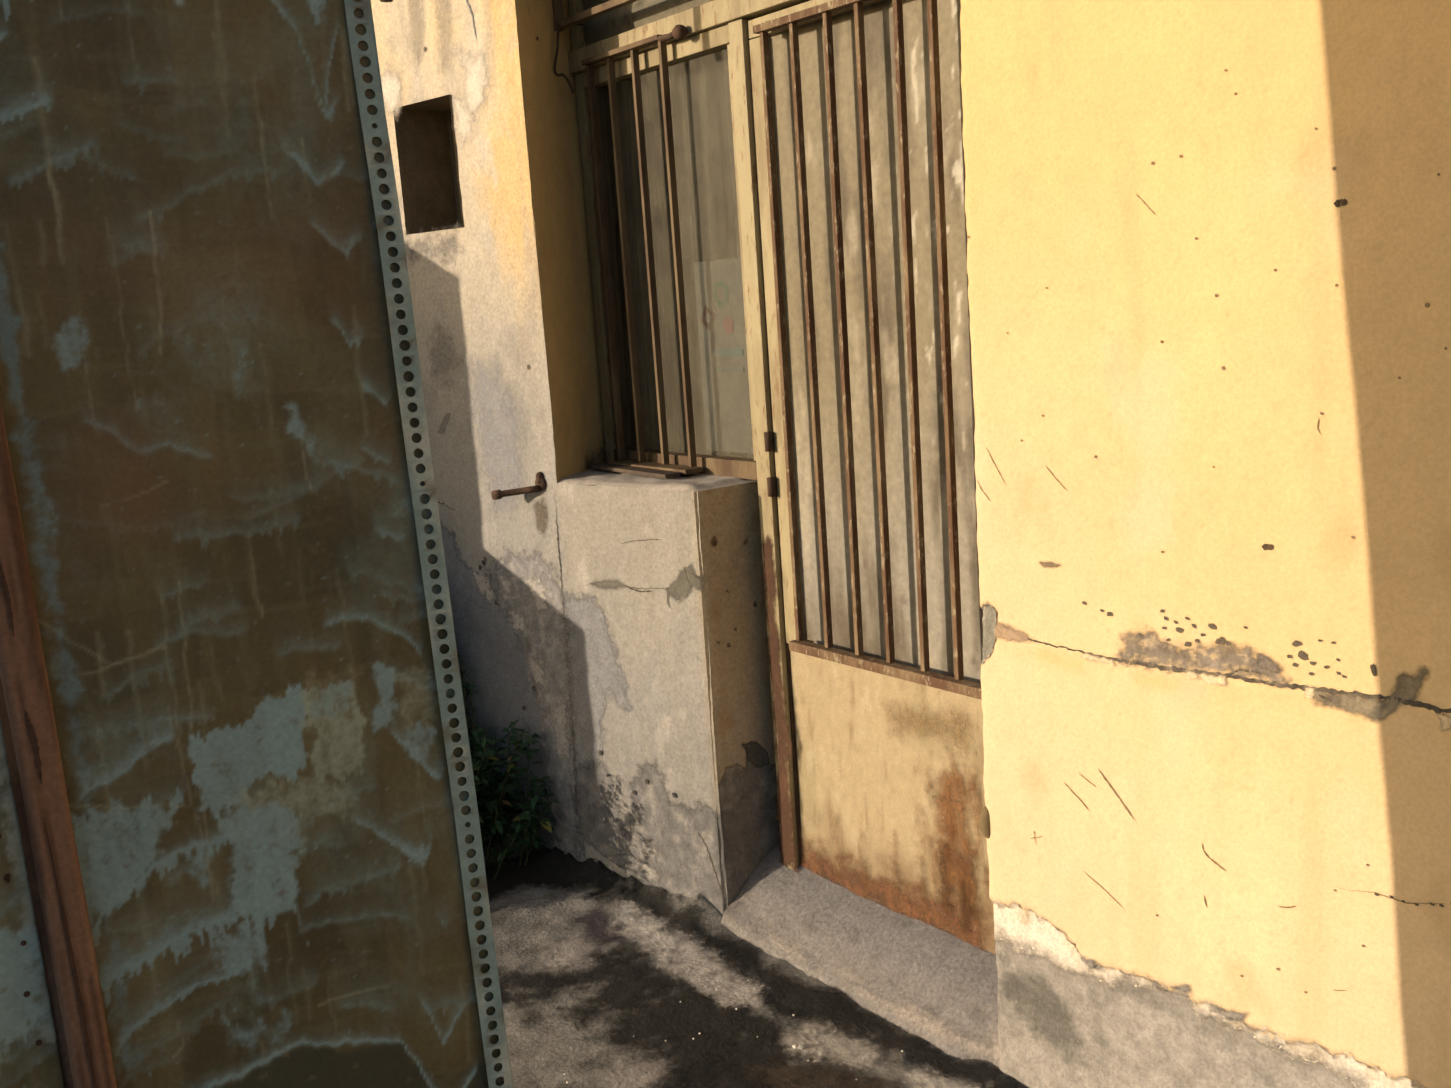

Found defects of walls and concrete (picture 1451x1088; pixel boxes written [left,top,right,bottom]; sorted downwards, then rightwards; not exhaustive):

peeling [441,526,780,914]
rust [762,537,989,951]
crack [1028,638,1451,730]
peeling [1117,609,1428,721]
damp [535,900,764,1008]
peeling [991,901,1425,1088]
damp [593,1056,672,1088]
damp [782,1023,980,1088]